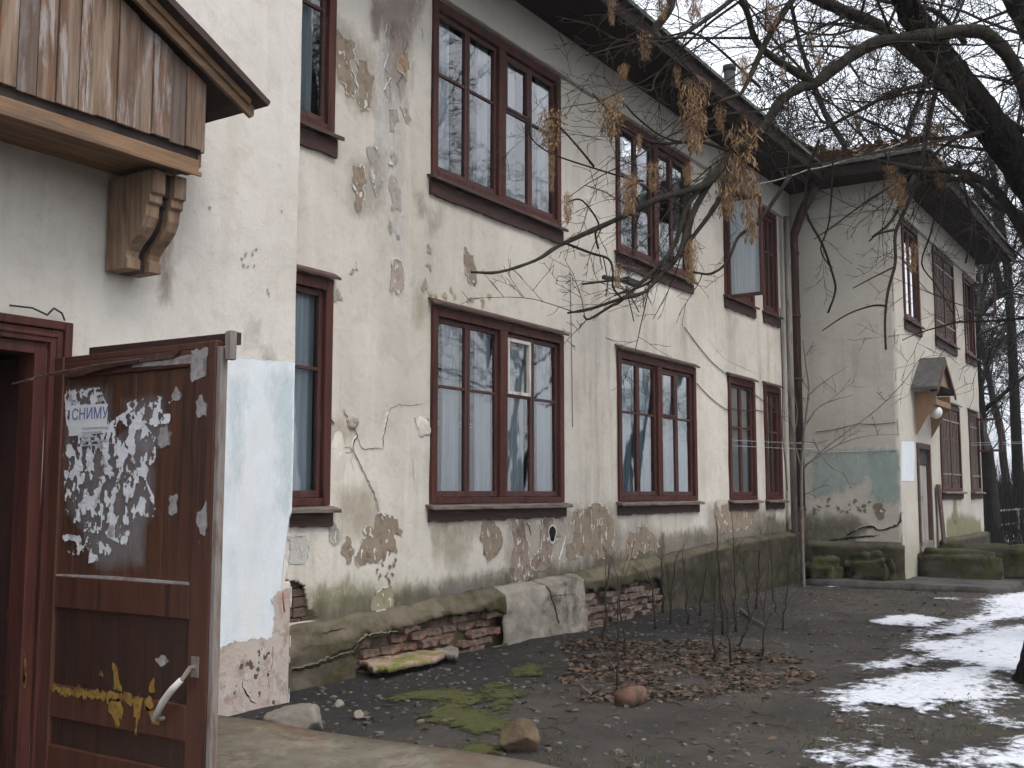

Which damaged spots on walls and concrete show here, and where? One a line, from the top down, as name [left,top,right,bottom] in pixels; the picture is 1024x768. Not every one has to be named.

peeling [336,29,376,112]
peeling [352,146,402,240]
peeling [421,243,492,308]
crack [331,404,429,520]
peeling [328,511,404,612]
peeling [480,501,660,582]
leakage [393,515,790,606]
leakage [806,516,867,541]
crack [827,512,903,541]
peeling [218,581,317,716]
crack [241,628,398,704]
flaking render [355,610,502,674]